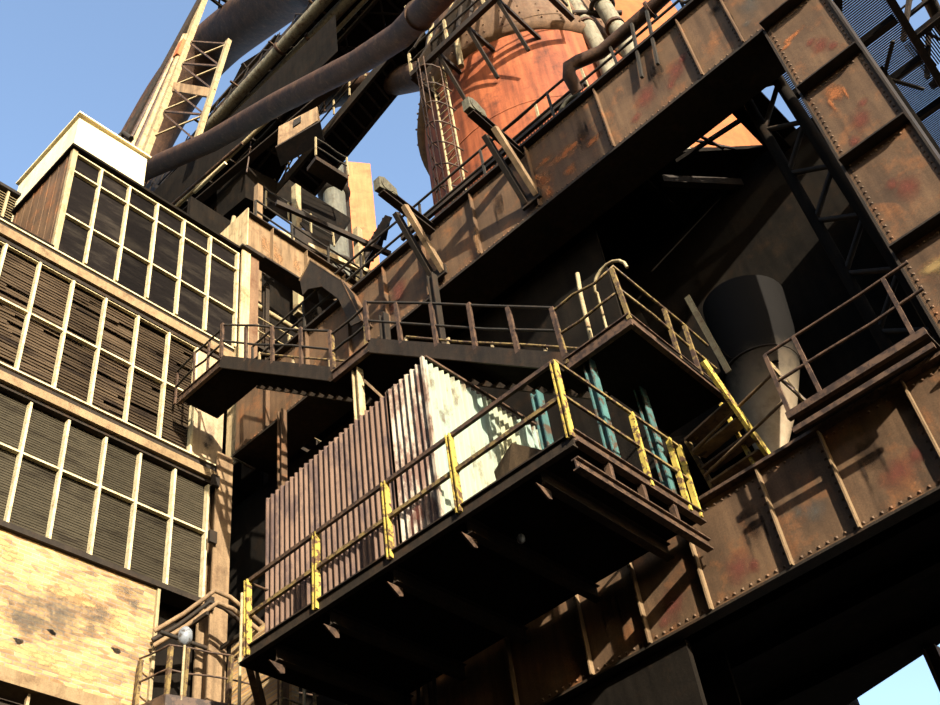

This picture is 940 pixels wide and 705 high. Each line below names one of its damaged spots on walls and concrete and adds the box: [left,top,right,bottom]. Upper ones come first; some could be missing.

corrosion [828,87,848,109]
corrosion [535,135,598,208]